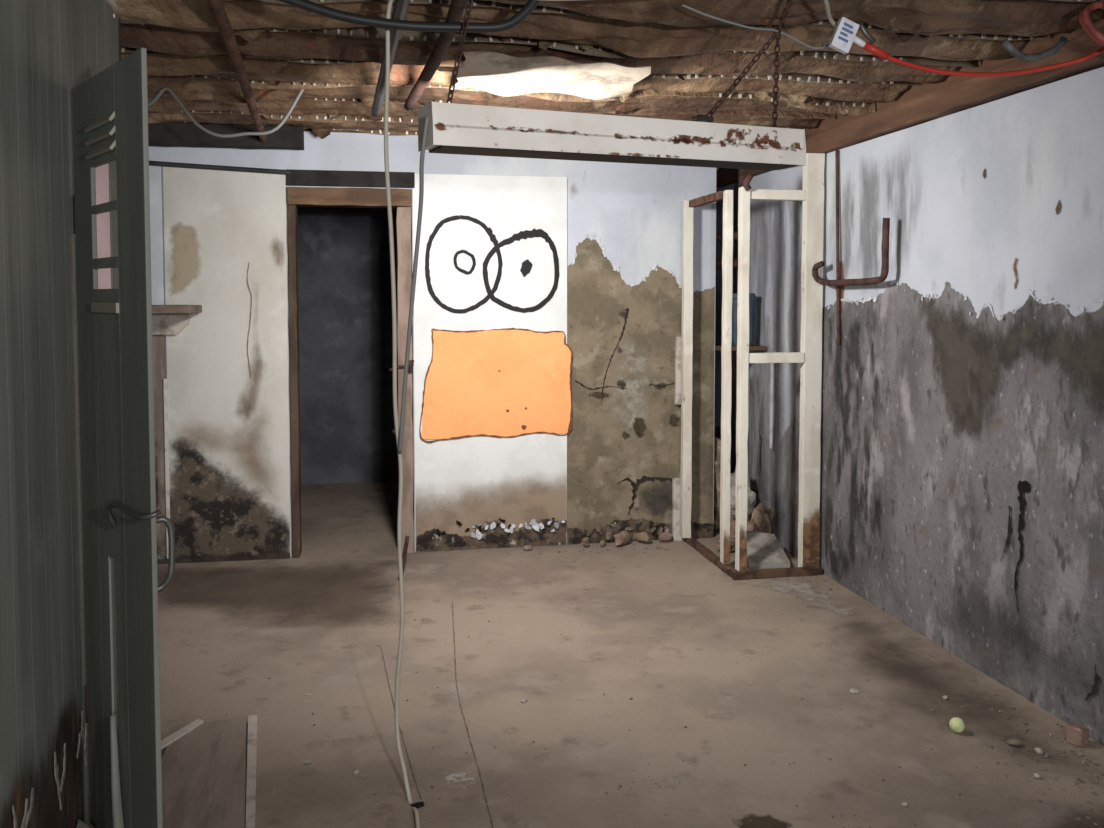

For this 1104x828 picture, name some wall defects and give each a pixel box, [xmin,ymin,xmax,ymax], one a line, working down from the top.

corrosion [490,125,597,136]
corrosion [612,128,801,158]
leakage [242,360,261,416]
peeling [416,232,800,558]
crack [575,308,675,403]
leakage [155,433,383,620]
peeling [819,281,1104,746]